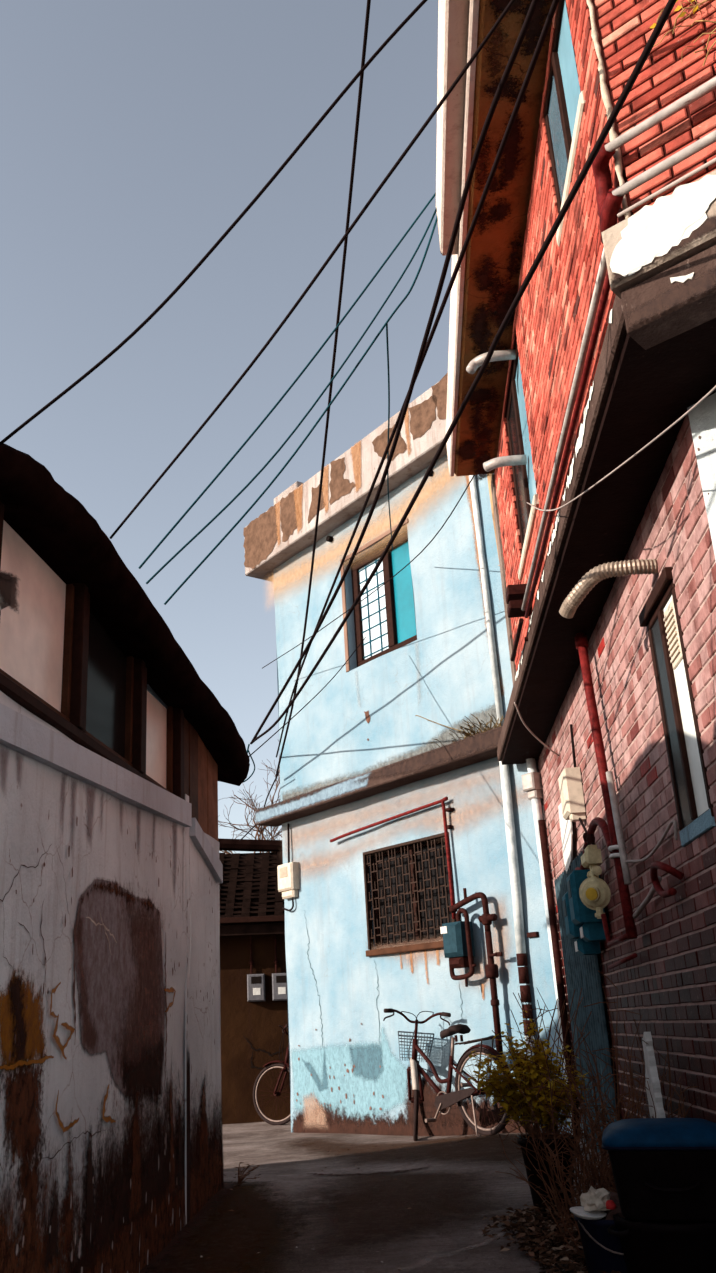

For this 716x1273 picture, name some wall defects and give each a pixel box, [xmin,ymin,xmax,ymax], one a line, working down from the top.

damp [473,0,551,236]
peeling [610,175,716,277]
peeling [670,272,694,283]
peeling [243,372,448,569]
damp [271,230,525,628]
peeling [0,572,18,611]
crack [0,844,72,987]
corrosion [0,969,46,1247]
crack [39,1130,105,1159]
damp [0,897,224,1273]